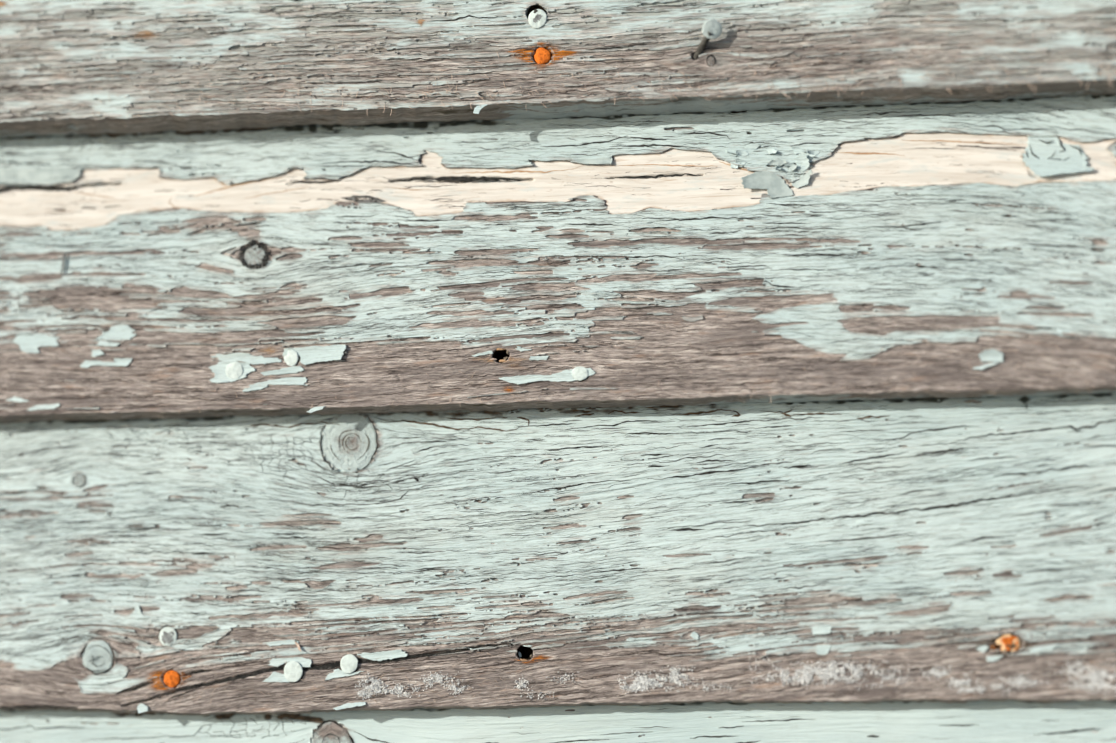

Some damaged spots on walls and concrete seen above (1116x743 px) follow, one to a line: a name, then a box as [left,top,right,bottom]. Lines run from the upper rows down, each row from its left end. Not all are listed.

corrosion [510,42,577,66]
peeling [0,7,1116,120]
peeling [0,132,1116,230]
peeling [23,278,156,306]
peeling [0,293,1116,416]
peeling [742,492,775,501]
crack [0,398,1116,743]
peeling [882,601,952,616]
peeling [0,605,1116,714]
corrosion [979,637,1033,657]
corrosion [148,671,190,690]